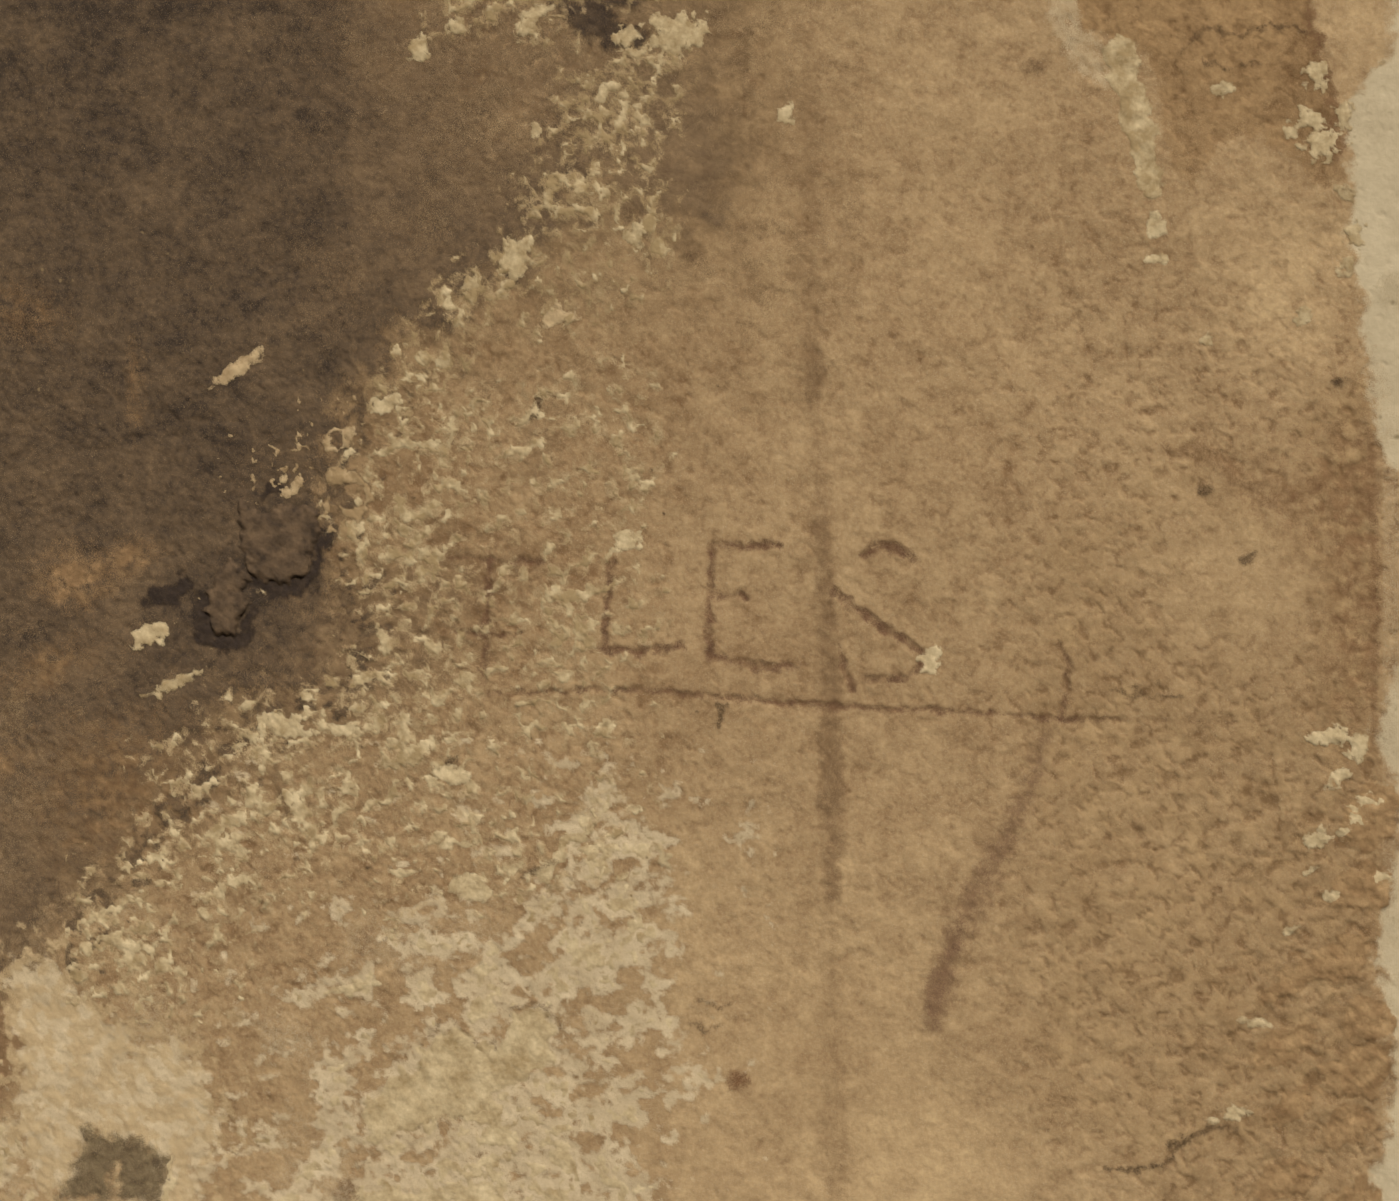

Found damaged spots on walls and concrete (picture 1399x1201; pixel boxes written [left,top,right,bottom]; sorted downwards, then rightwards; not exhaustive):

peeling [1209,80,1237,99]
peeling [1282,61,1356,165]
peeling [0,0,738,1201]
peeling [722,799,771,863]
damp [0,1040,207,1201]